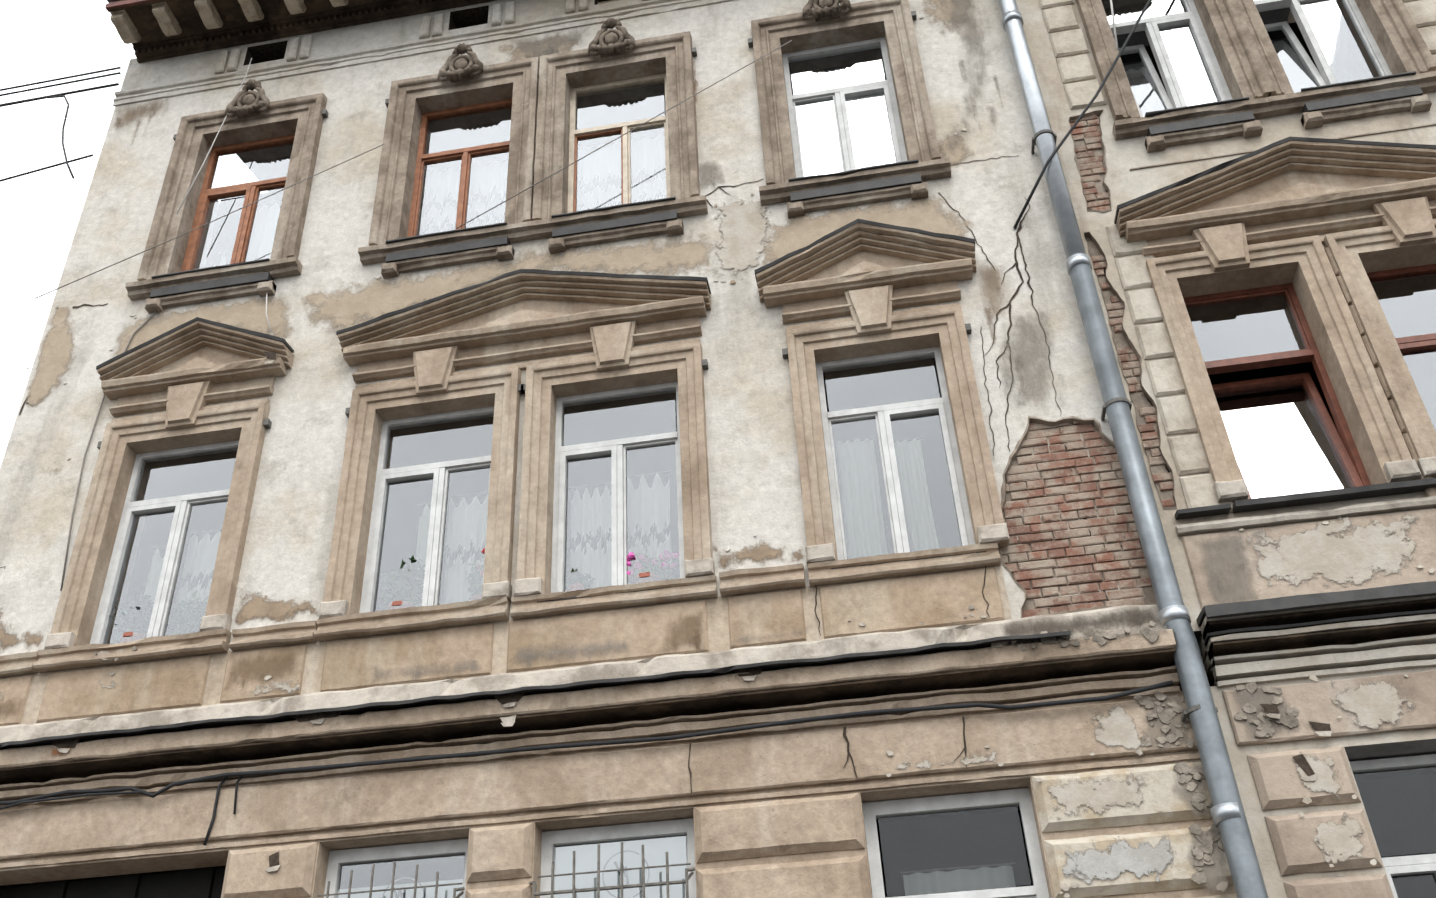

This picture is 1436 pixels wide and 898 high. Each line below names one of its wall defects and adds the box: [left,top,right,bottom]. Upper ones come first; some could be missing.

flaking render [1068,110,1112,213]
peeling [27,306,73,405]
crack [939,155,1061,456]
flaking render [1084,232,1177,510]
flaking render [991,416,1166,651]
peeling [1239,513,1436,587]
peeling [0,608,43,649]
peeling [235,585,317,624]
peeling [1234,674,1415,738]
peeling [1036,692,1228,898]
peeling [1293,752,1377,868]